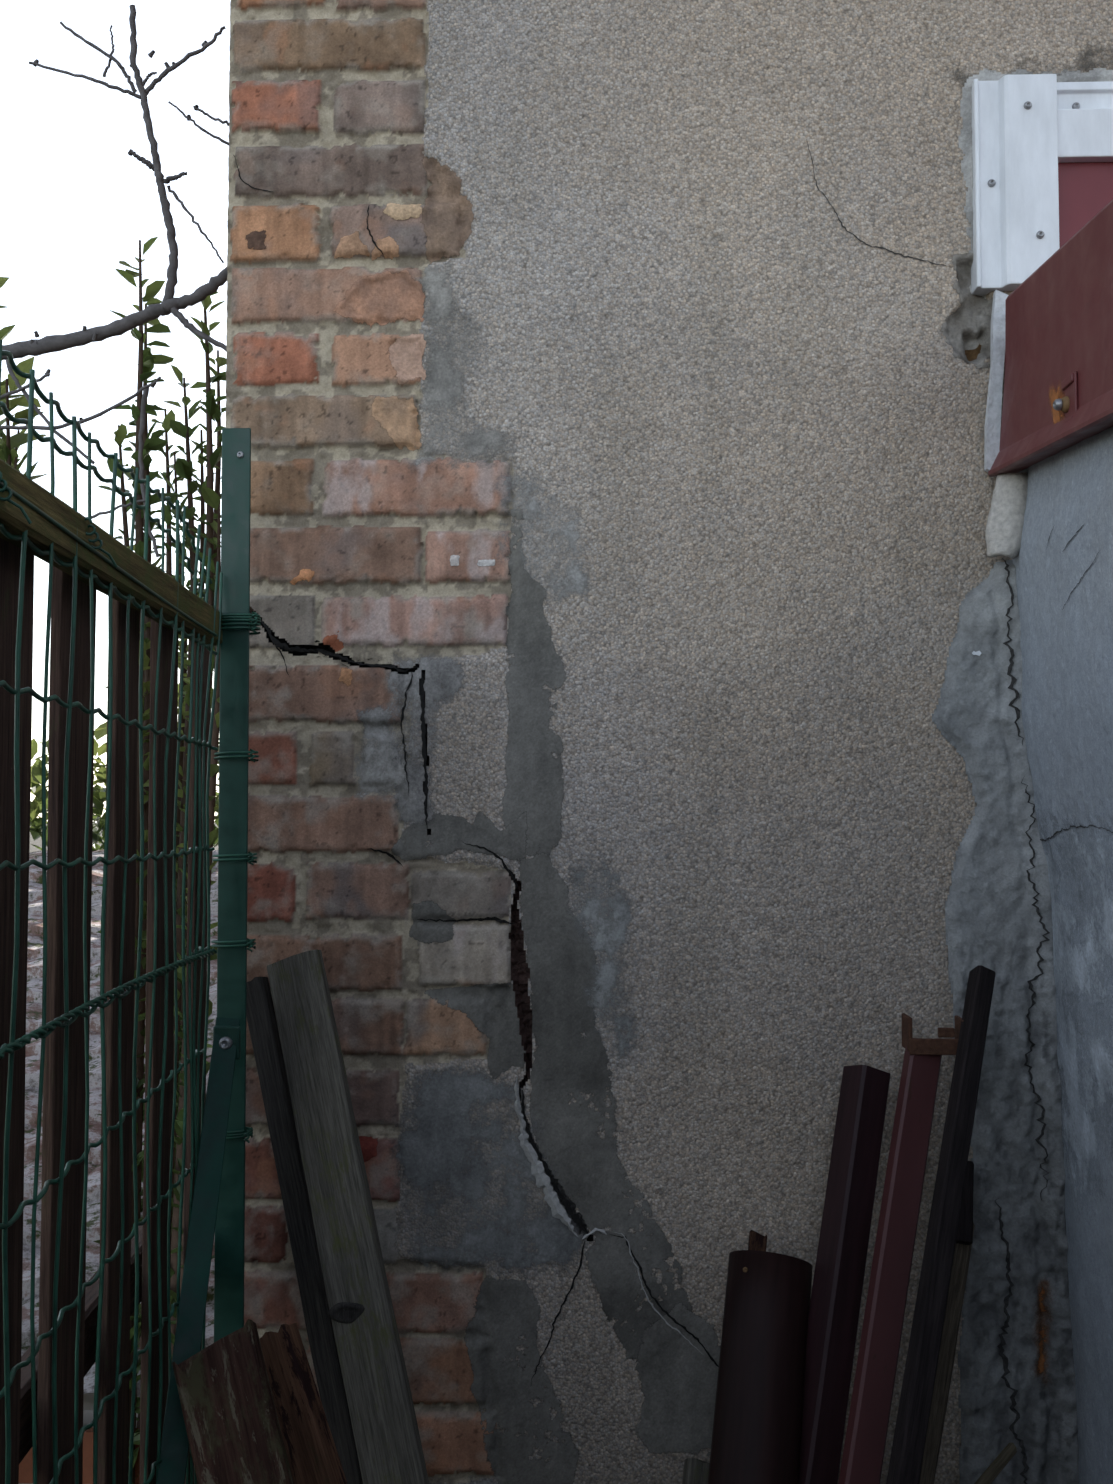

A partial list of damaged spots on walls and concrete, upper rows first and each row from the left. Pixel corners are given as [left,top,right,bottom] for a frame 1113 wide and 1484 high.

spalling [245,230,266,250]
crack [806,139,946,266]
spalling [333,157,476,451]
flaking render [941,253,993,369]
peeling [985,473,1028,559]
spalling [290,569,314,585]
spalling [323,631,353,686]
crack [250,607,429,833]
crack [369,848,402,865]
spalling [359,1136,378,1162]
crack [416,842,719,1385]